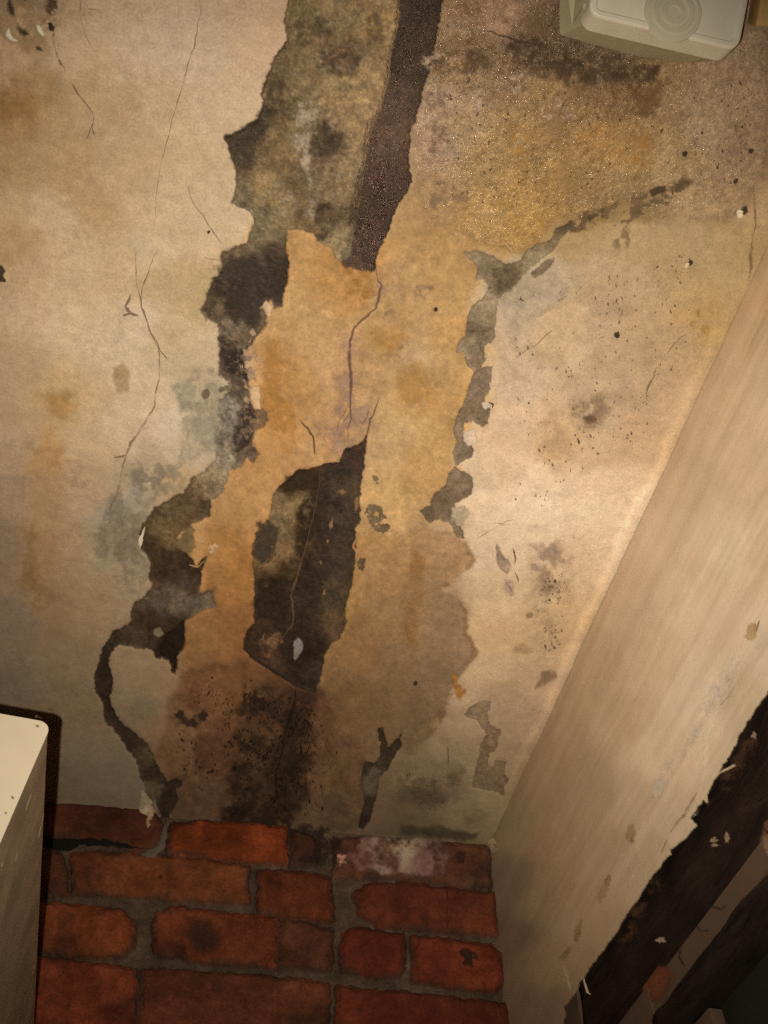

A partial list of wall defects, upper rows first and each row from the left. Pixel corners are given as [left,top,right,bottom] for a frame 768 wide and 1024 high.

crack [123,271,165,412]
peeling [94,0,443,829]
crack [339,270,382,440]
damp [161,0,768,829]
peeling [465,701,509,795]
damp [337,772,476,876]
flaking render [643,967,673,1002]